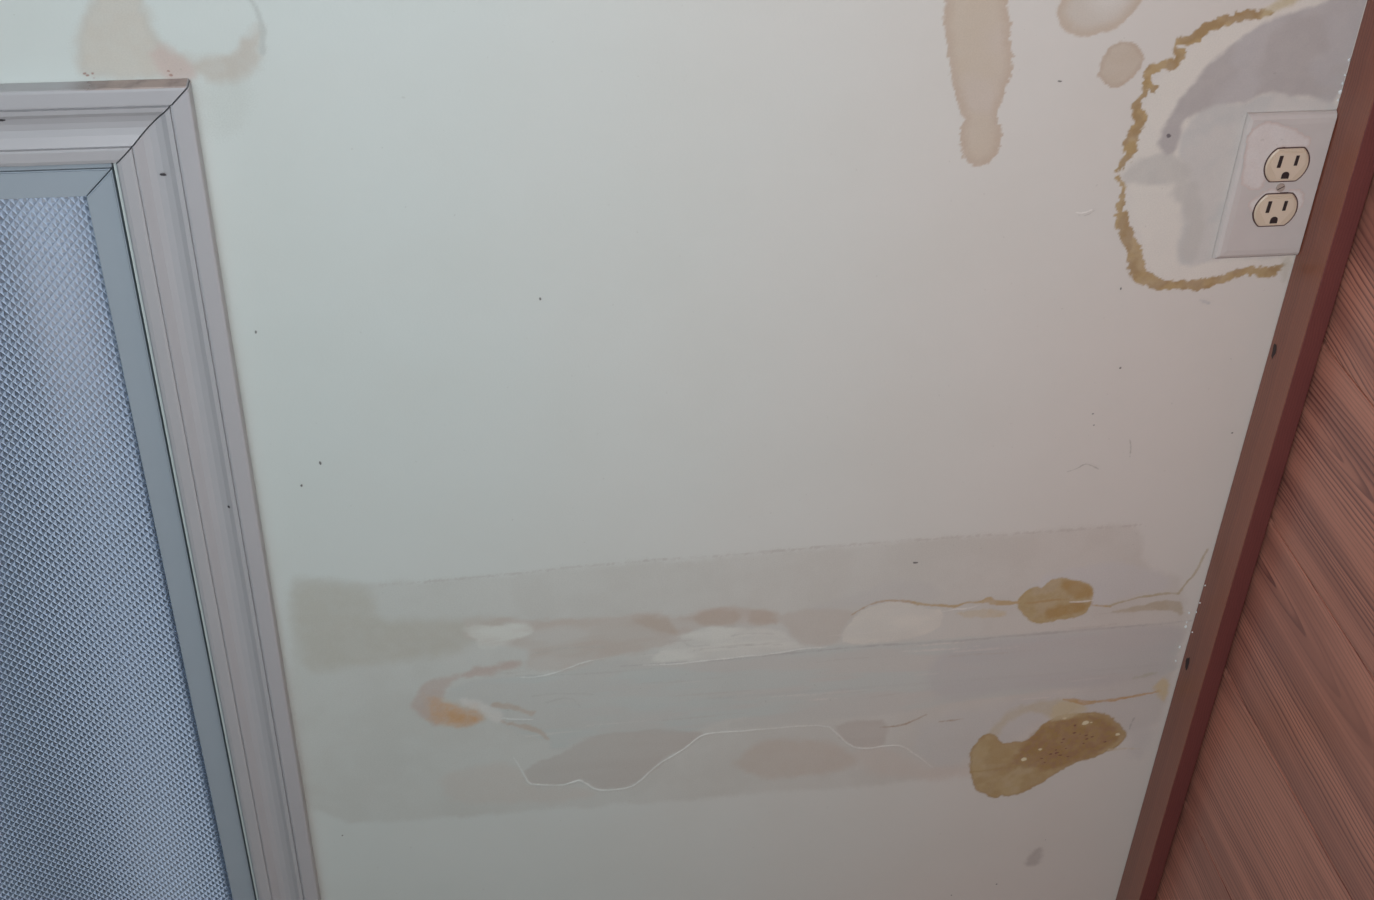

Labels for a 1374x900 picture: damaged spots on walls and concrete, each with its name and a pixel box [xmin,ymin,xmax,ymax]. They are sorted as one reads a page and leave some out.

damp [940,0,1016,169]
damp [1054,0,1341,294]
peeling [280,520,1206,827]
damp [967,695,1141,800]
damp [1016,576,1096,625]